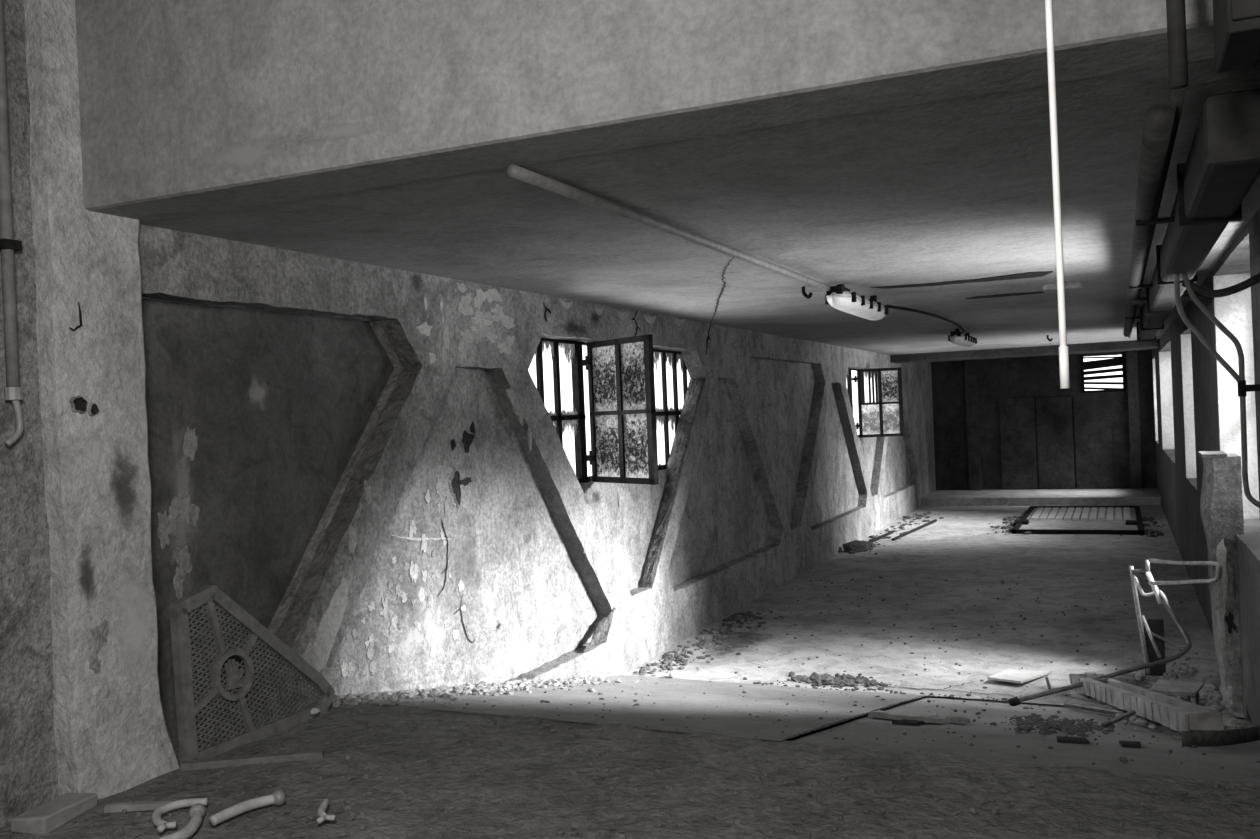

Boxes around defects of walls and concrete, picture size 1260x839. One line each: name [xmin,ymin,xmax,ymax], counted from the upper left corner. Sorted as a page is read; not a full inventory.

peeling [415,283,515,365]
crack [705,257,734,354]
peeling [279,421,476,703]